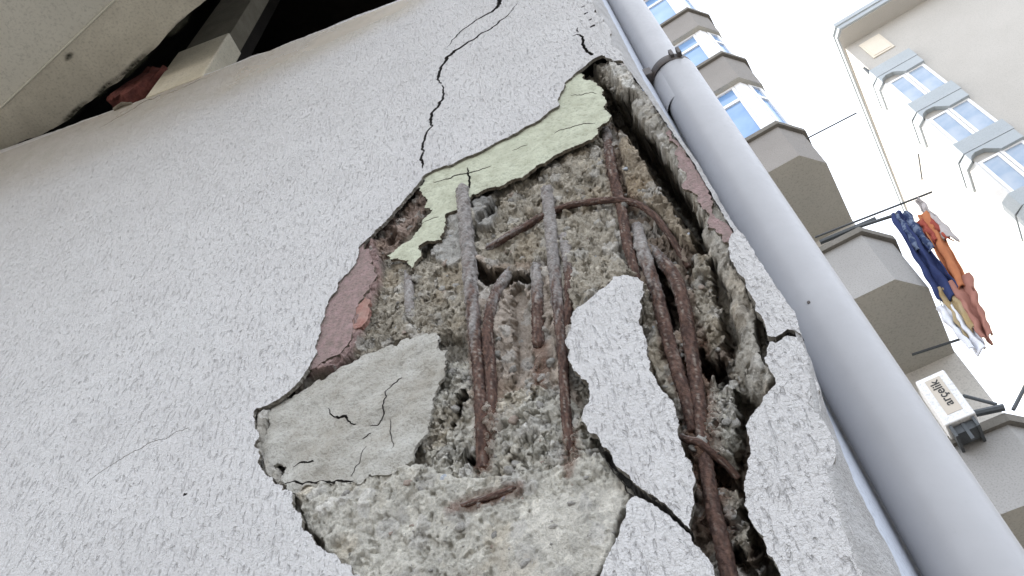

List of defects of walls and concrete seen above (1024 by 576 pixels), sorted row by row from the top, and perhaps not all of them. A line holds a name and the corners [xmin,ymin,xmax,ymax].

crack [419,0,517,188]
crack [574,28,596,65]
spalling [255,61,781,576]
crack [765,333,804,347]
crack [285,377,402,485]
crack [602,450,694,542]